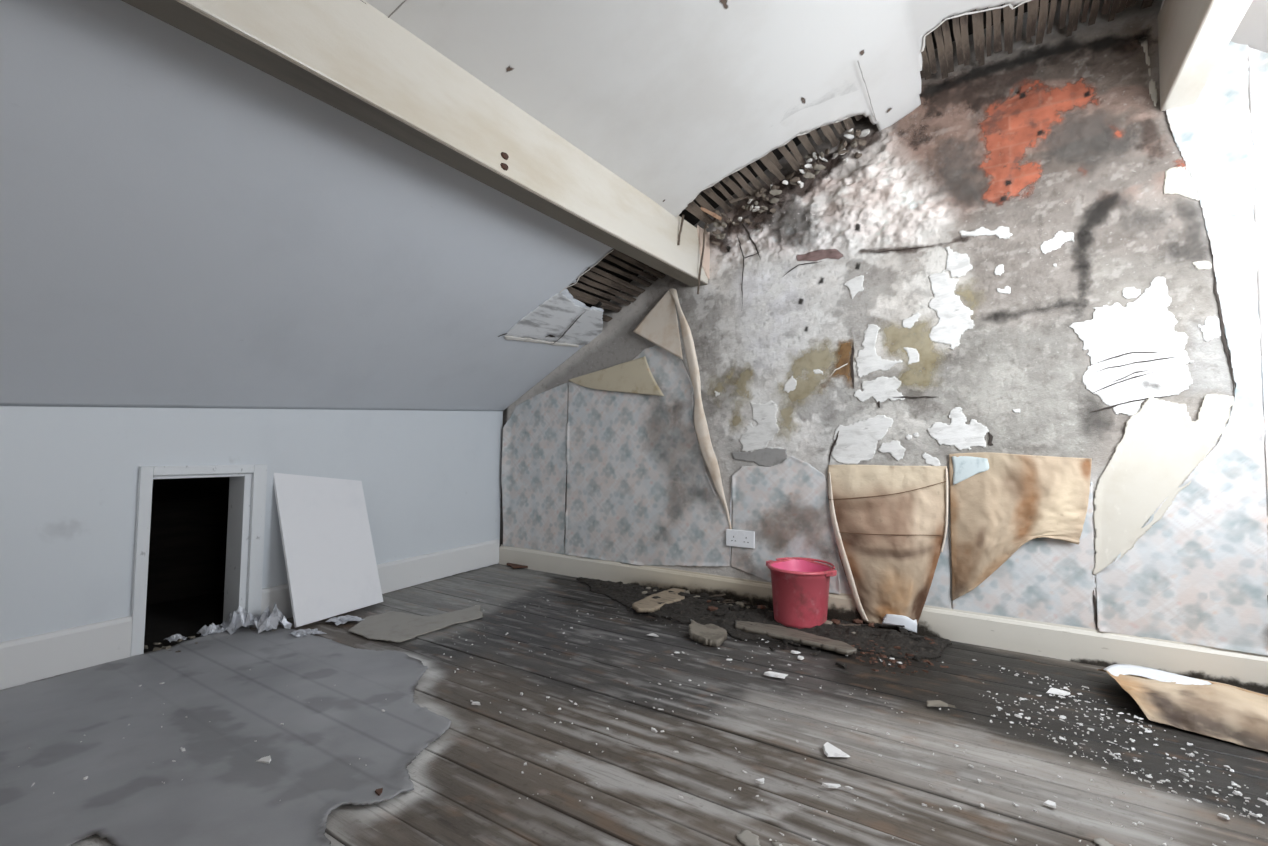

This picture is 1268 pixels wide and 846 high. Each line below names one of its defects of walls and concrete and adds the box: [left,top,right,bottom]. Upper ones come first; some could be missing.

flaking render [979,77,1099,206]
damp [1045,113,1164,163]
peeling [1163,161,1200,201]
peeling [959,226,1012,239]
damp [1039,195,1126,310]
damp [712,369,753,398]
damp [780,343,840,429]
peeling [831,324,989,466]
damp [884,322,940,387]
peeling [902,246,975,350]
damp [988,312,1017,321]
peeling [1069,277,1222,416]